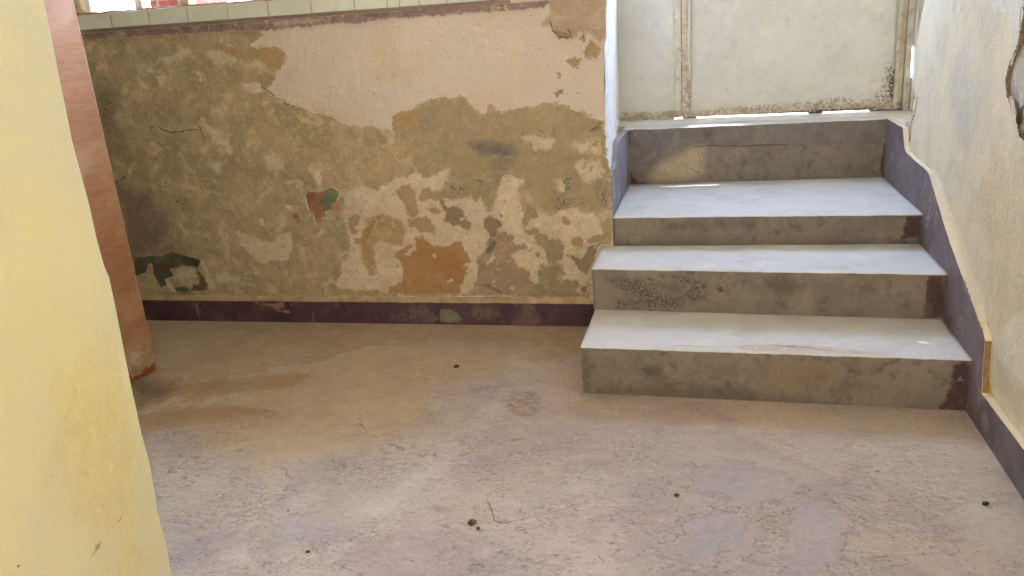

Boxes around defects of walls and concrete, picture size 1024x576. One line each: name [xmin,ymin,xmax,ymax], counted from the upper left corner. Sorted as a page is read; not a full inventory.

peeling [81,0,551,97]
spalling [988,0,1024,137]
crack [150,114,205,152]
peeling [199,116,236,177]
peeling [520,130,556,152]
peeling [552,135,606,196]
peeling [134,149,608,324]
peeling [126,343,155,378]